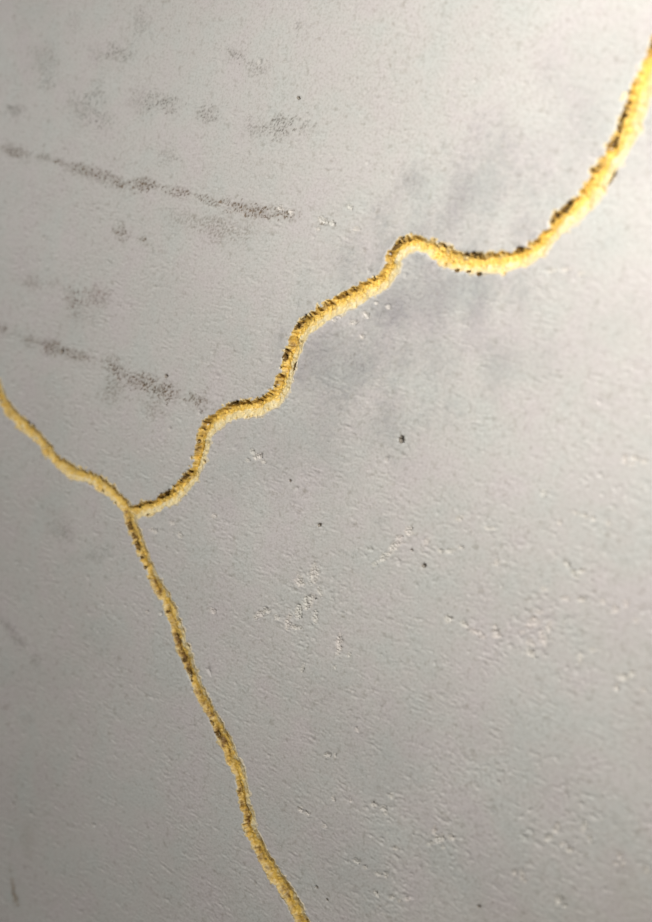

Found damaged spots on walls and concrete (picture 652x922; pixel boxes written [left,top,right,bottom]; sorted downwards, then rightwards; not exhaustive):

crack [0,36,652,520]
crack [123,508,311,922]